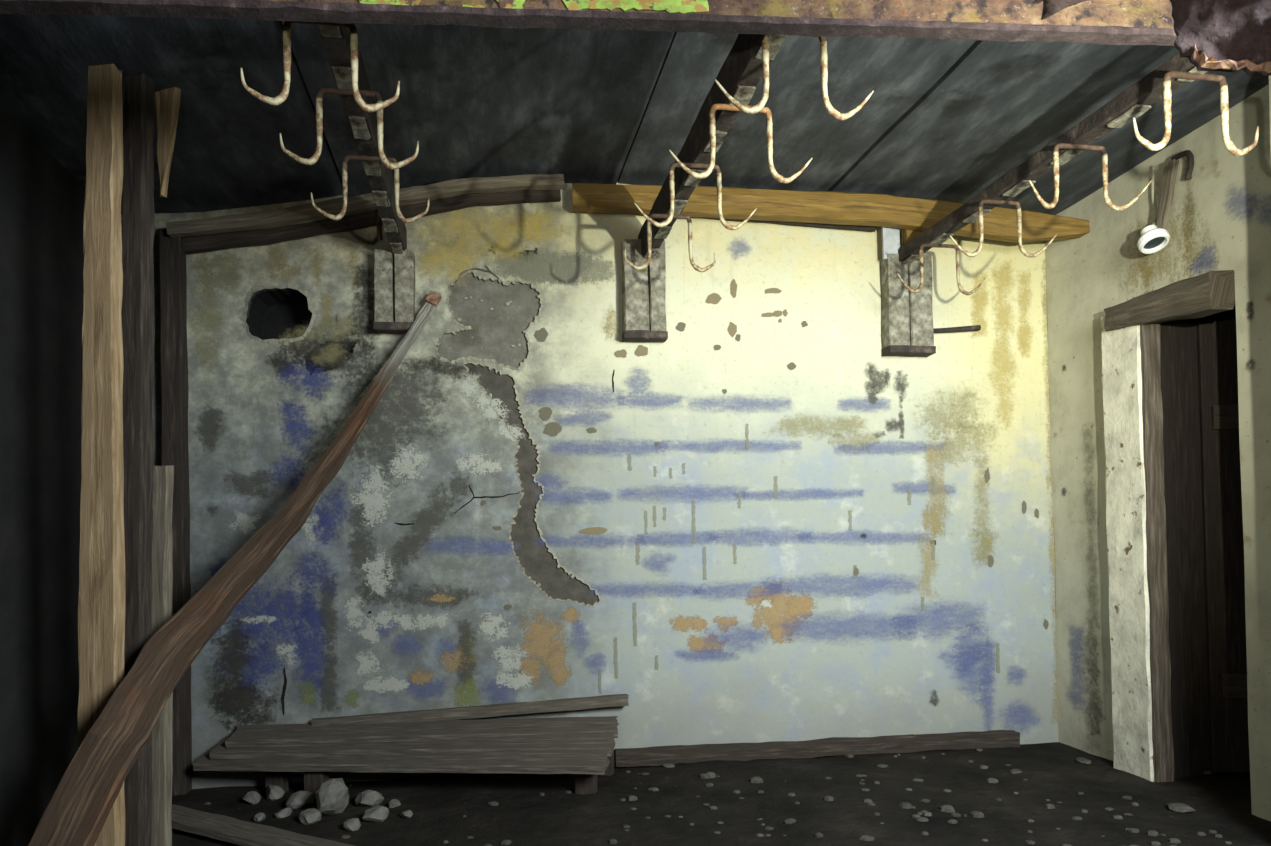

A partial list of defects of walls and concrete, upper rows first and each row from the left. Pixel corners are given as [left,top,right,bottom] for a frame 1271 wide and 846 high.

spalling [240,282,316,346]
spalling [434,270,600,607]